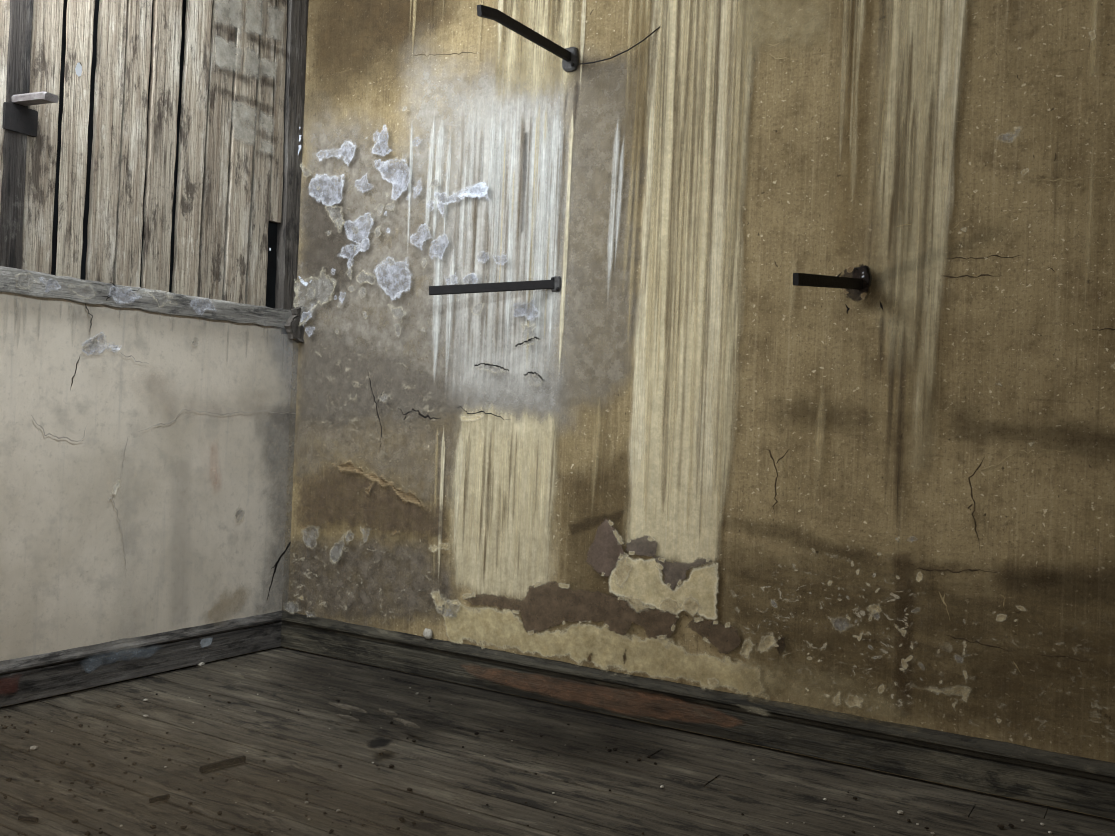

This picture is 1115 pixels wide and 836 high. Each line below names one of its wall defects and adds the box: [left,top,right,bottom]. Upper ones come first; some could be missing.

peeling [284,125,488,343]
leakage [878,0,965,463]
leakage [258,0,818,626]
crack [367,370,511,446]
crack [108,439,128,569]
crack [267,542,291,599]
peeling [423,519,970,727]
crack [766,449,789,515]
crack [912,458,1005,605]
leakage [830,588,1115,719]